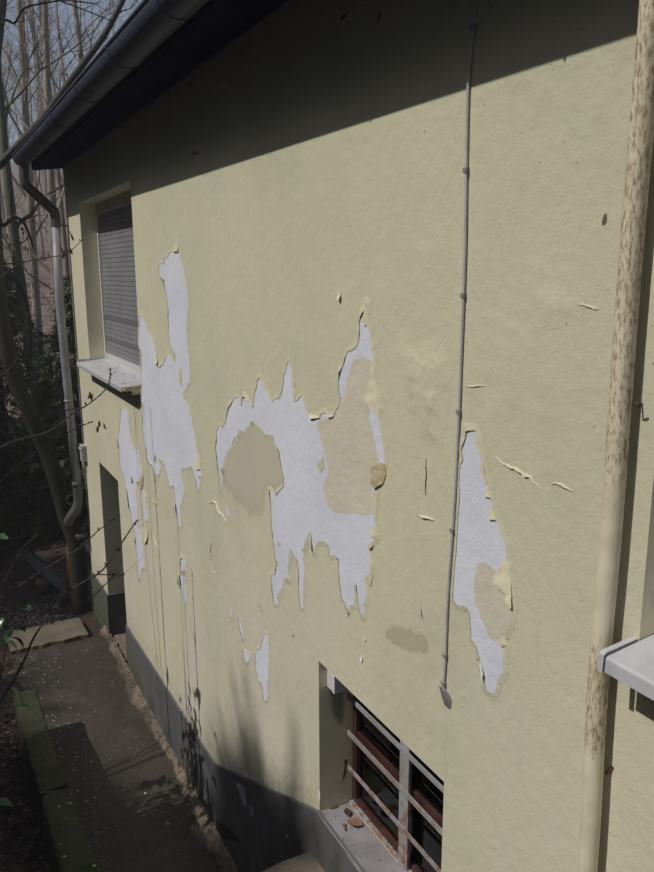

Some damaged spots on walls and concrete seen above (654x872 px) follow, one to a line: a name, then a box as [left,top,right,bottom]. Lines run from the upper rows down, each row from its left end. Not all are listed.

rust [630,0,654,121]
peeling [116,239,203,584]
peeling [228,604,271,703]
peeling [214,295,388,622]
peeling [449,422,518,701]
rust [606,131,650,481]